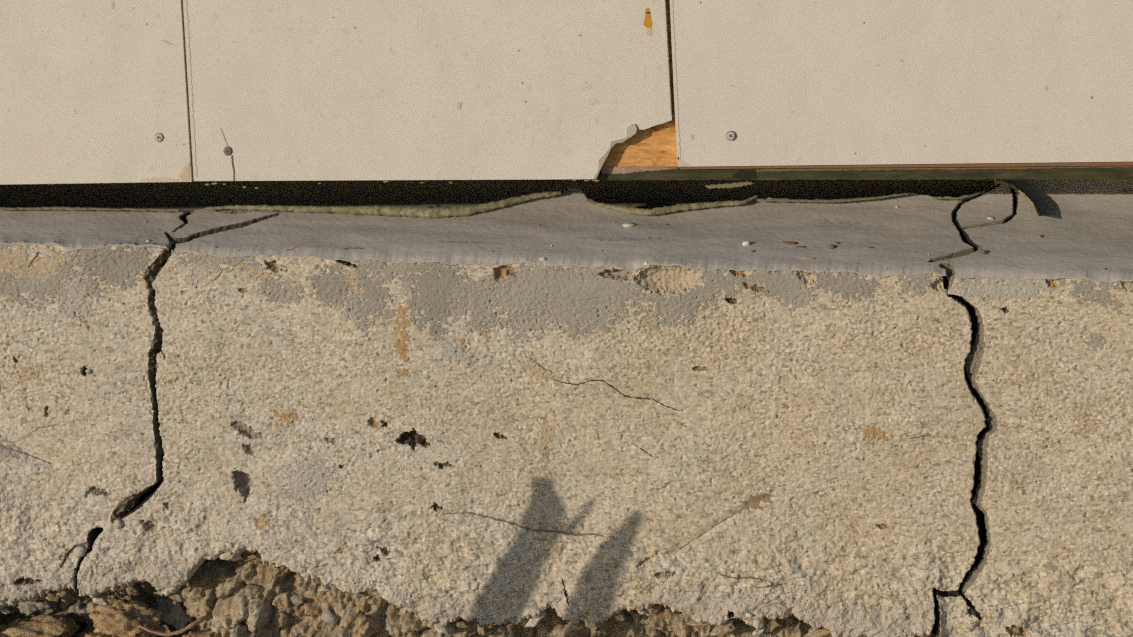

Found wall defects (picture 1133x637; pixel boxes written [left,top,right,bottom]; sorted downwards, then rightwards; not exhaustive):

spalling [593,124,640,179]
crack [61,211,280,595]
crack [930,184,1018,637]
spalling [0,604,35,623]
spalling [13,550,812,637]
spalling [1006,625,1029,637]